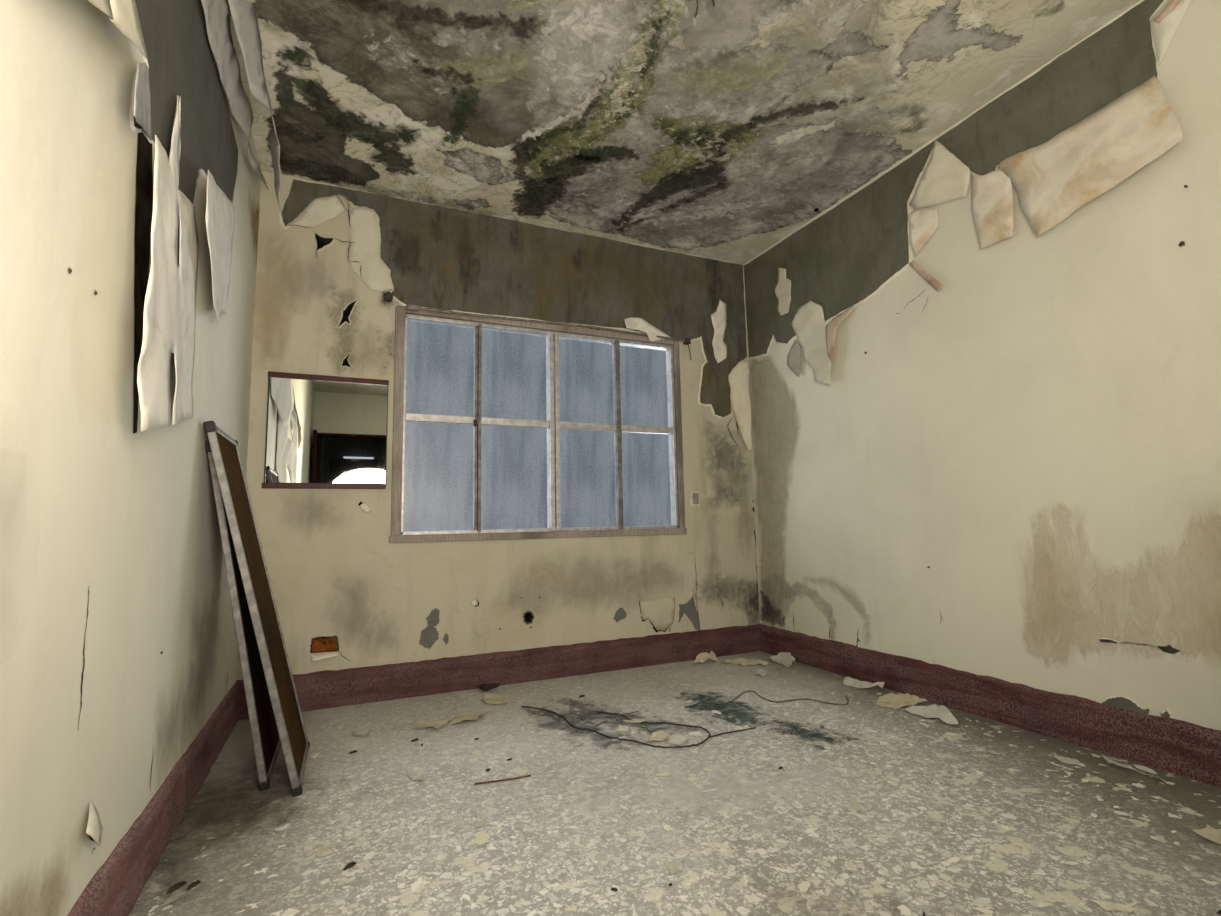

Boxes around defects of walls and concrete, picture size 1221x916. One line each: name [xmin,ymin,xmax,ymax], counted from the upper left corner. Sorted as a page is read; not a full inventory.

damp [270,46,420,180]
damp [339,0,874,243]
peeling [201,0,1023,250]
damp [252,207,260,254]
damp [703,360,796,625]
crack [78,586,90,730]
flaking render [418,607,450,650]
flaking render [612,606,627,623]
flaking render [677,562,700,630]
flaking render [1101,695,1172,718]